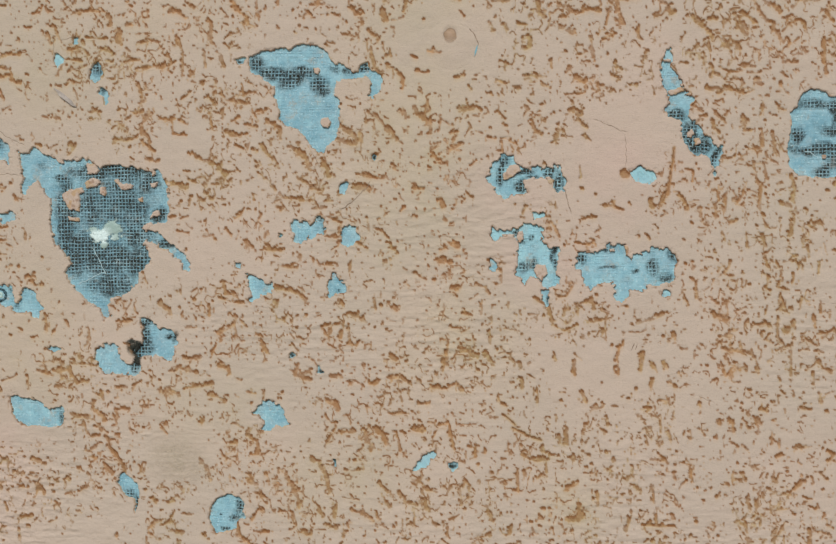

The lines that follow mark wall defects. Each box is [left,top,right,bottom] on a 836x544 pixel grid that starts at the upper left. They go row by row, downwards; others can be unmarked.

peeling [236,44,383,153]
peeling [660,47,723,176]
peeling [787,89,836,178]
peeling [486,154,567,199]
peeling [0,139,190,319]
peeling [279,216,326,244]
peeling [490,212,560,307]
peeling [572,242,677,303]
peeling [95,318,178,376]
peeling [11,395,65,427]
peeling [252,400,290,431]
peeling [210,494,246,533]